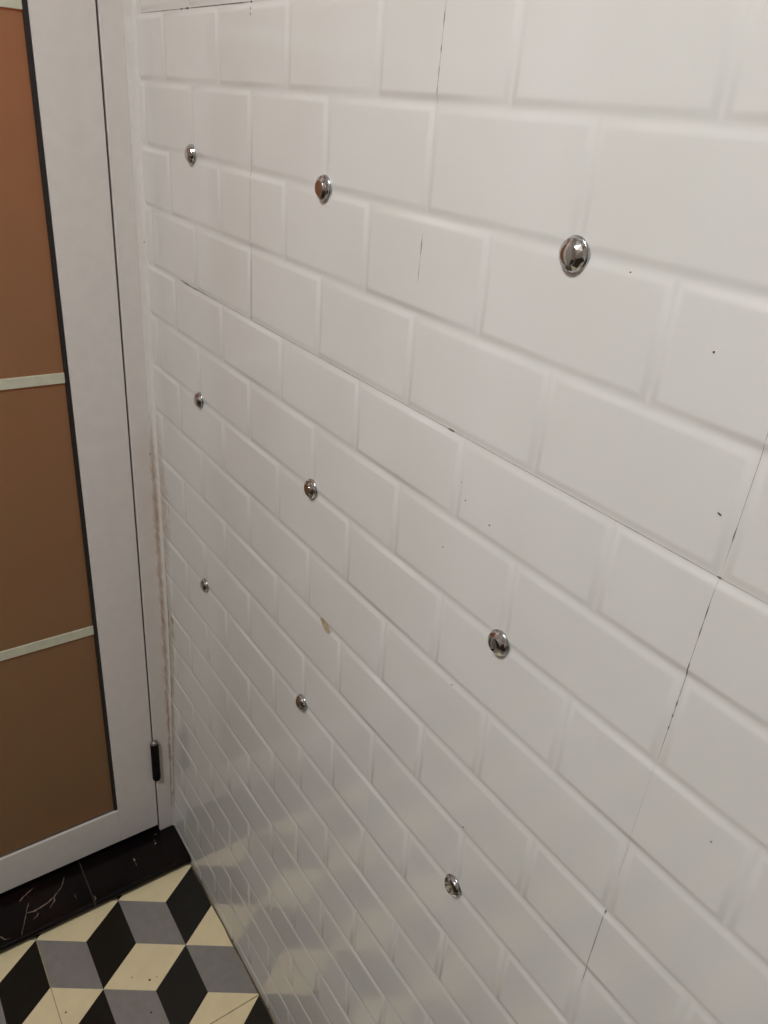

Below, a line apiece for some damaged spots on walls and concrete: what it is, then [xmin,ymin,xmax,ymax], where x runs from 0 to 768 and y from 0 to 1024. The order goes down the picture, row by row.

crack [180,279,768,761]
crack [582,910,607,980]